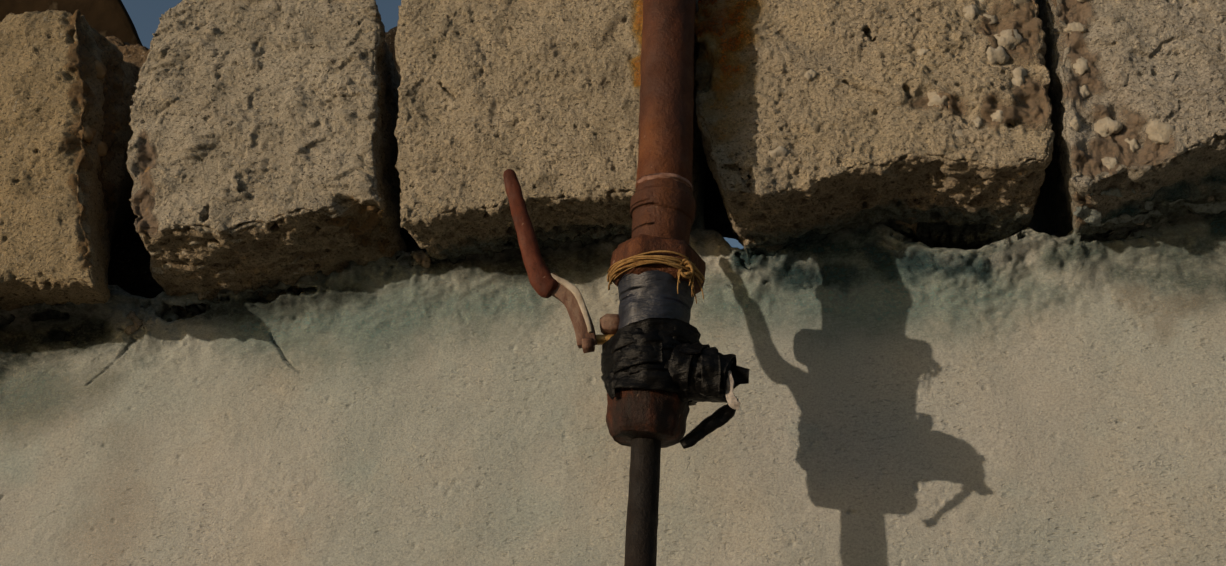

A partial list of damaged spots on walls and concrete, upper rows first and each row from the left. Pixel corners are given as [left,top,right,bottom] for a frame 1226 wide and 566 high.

rust [630,0,643,87]
leakage [183,236,539,344]
leakage [709,230,1030,322]
leakage [1042,170,1226,294]
leakage [0,316,111,411]